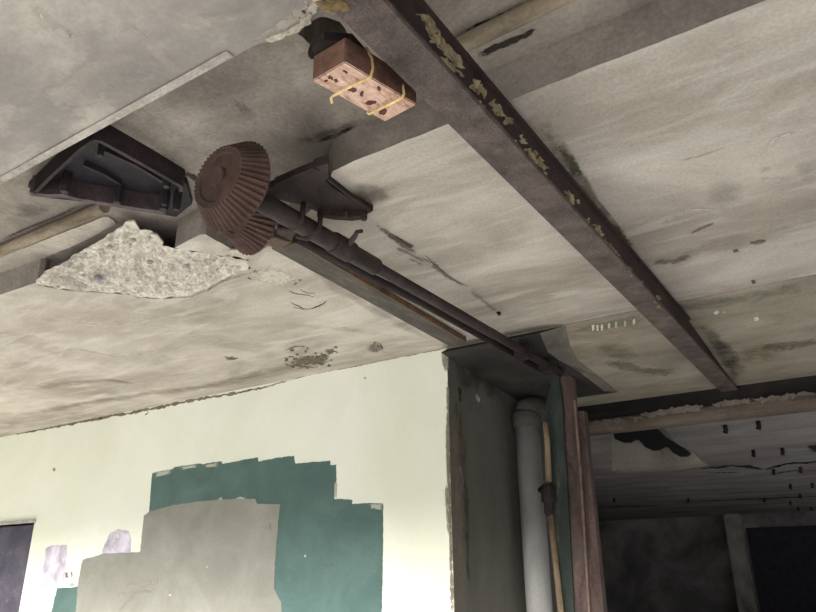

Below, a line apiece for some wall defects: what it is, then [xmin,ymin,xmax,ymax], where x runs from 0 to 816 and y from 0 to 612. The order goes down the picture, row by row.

spalling [263,0,351,43]
spalling [36,220,302,299]
crack [422,256,466,286]
peeling [592,391,816,426]